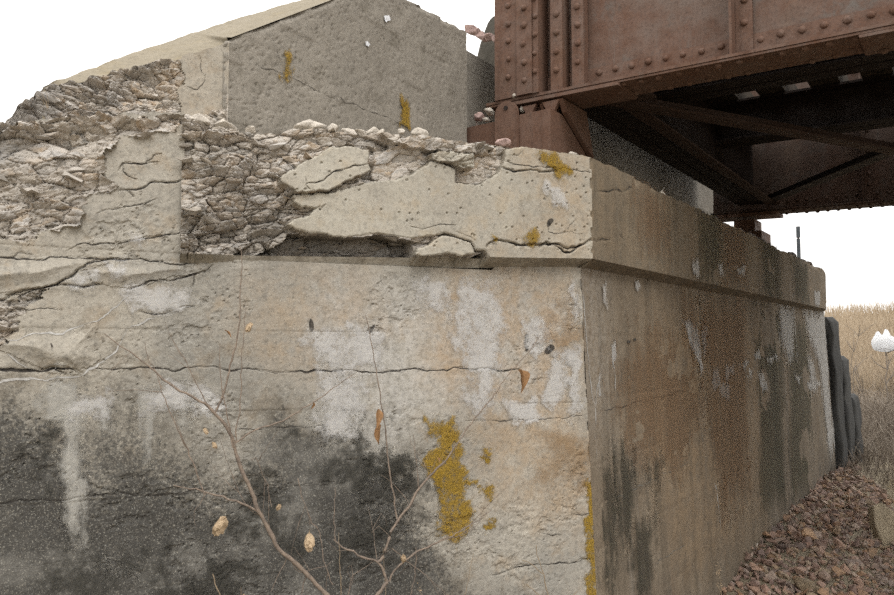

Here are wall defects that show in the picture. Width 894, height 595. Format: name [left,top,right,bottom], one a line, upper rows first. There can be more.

spalling [0,288,49,346]
crack [99,154,181,213]
spalling [0,59,510,258]
crack [0,233,516,383]
crack [490,224,622,253]
water stain [685,291,835,453]
water stain [602,444,652,595]